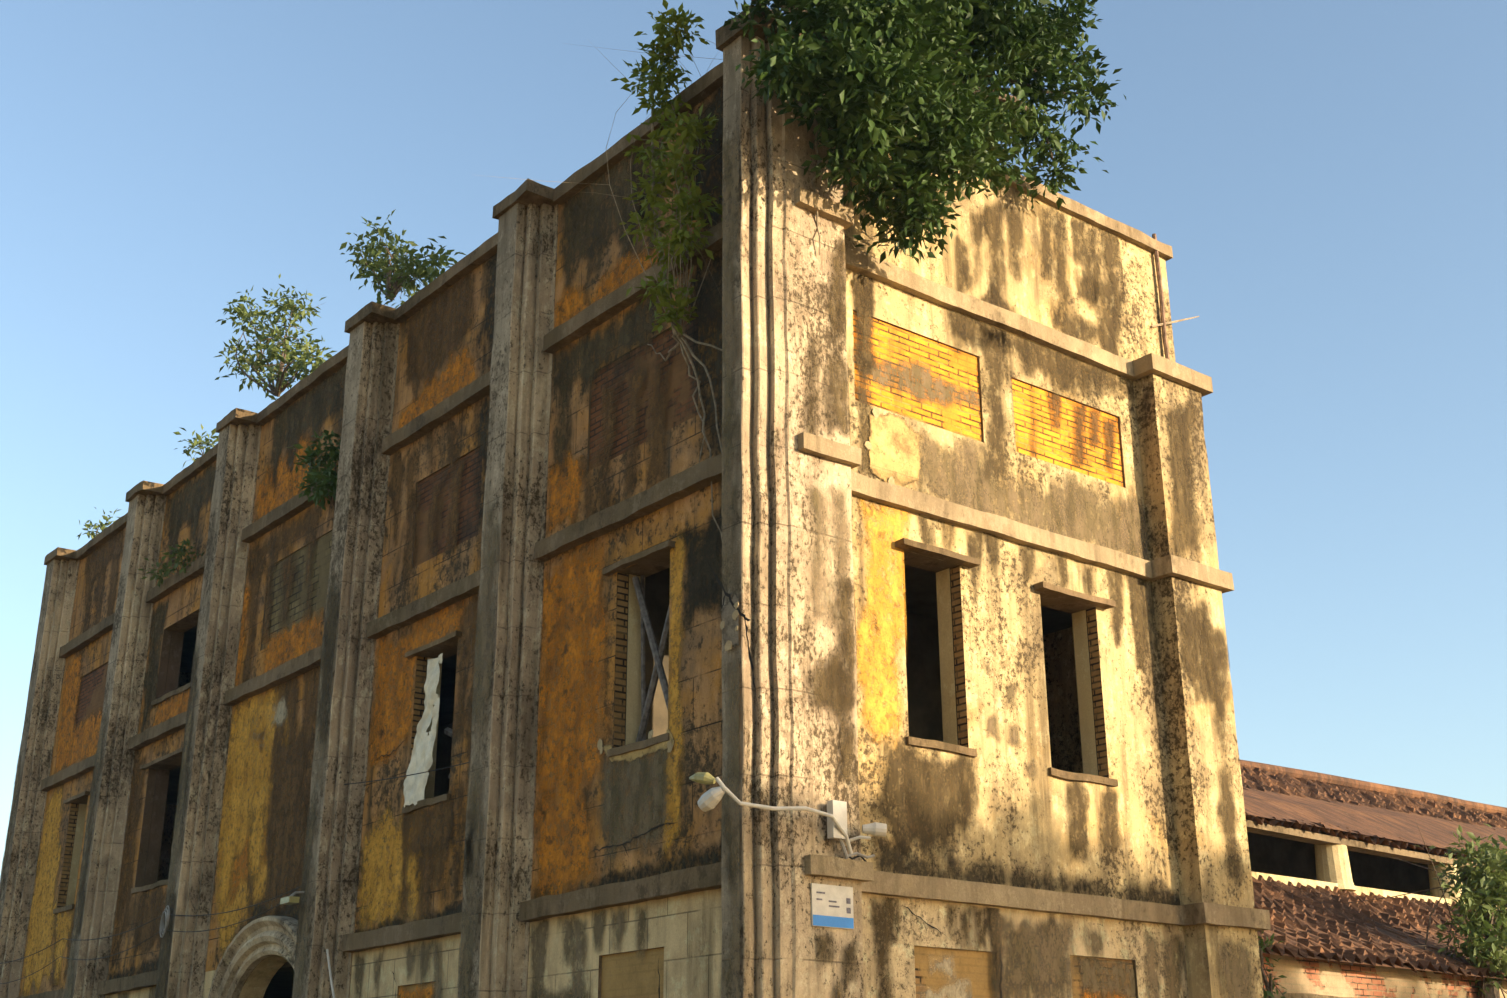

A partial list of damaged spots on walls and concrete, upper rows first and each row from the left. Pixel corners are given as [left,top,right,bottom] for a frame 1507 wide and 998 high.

damp [680,86,739,625]
damp [808,202,1149,561]
damp [1169,401,1201,554]
damp [919,515,999,601]
damp [1023,546,1035,578]
damp [1058,556,1158,668]
damp [988,717,1020,745]
damp [1007,684,1015,704]
damp [1176,600,1244,883]
damp [530,663,740,998]